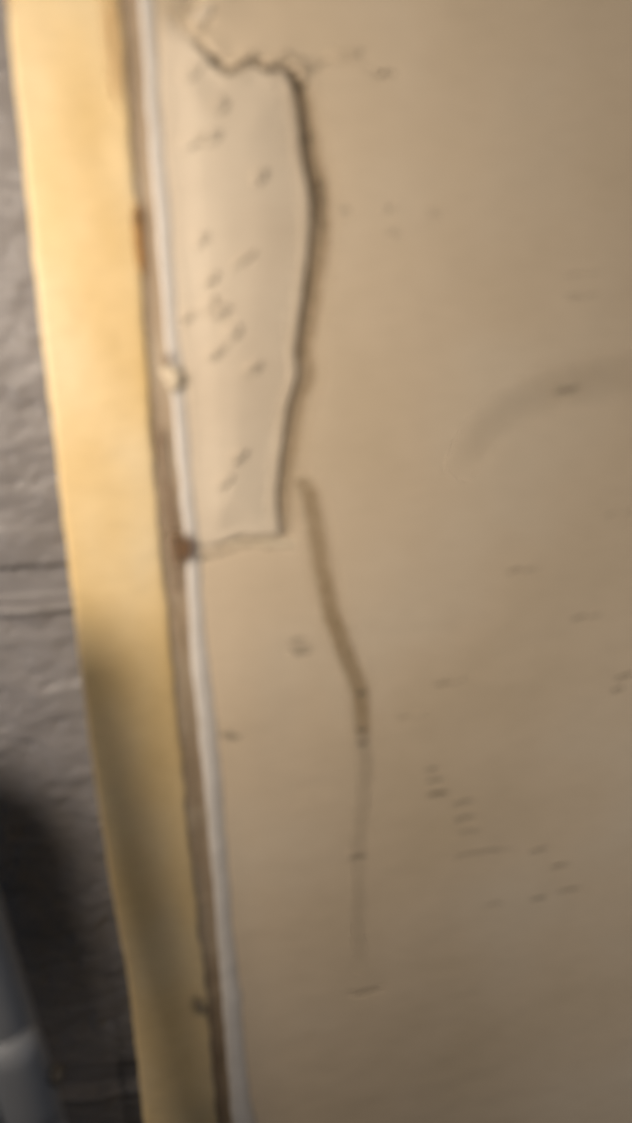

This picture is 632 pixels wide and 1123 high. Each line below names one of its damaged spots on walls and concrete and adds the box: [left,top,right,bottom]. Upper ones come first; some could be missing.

crack [206,51,311,85]